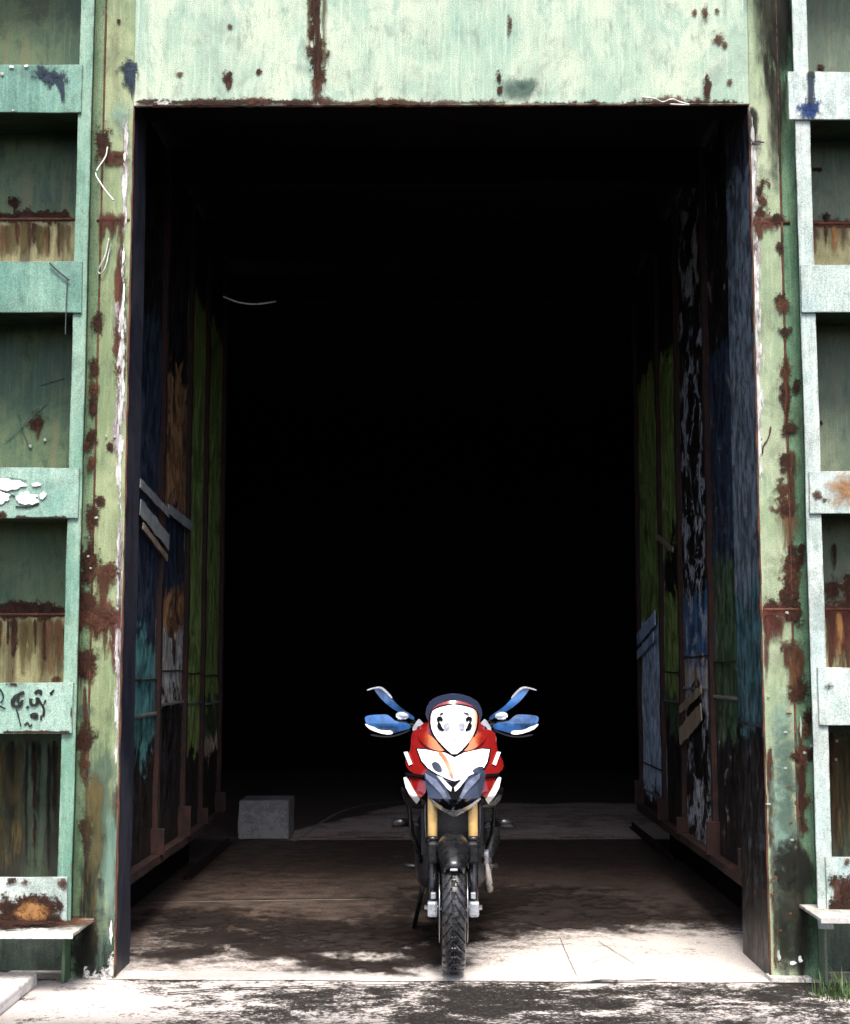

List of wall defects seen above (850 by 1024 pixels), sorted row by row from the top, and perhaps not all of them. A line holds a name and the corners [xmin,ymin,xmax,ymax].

corrosion [136,0,607,105]
corrosion [692,5,728,48]
corrosion [93,120,129,167]
corrosion [98,211,126,250]
corrosion [753,179,786,254]
corrosion [83,357,116,474]
corrosion [776,355,801,436]
peeling [0,478,47,508]
corrosion [0,495,121,787]
corrosion [763,450,813,838]
corrosion [825,544,850,668]
corrosion [0,785,118,956]